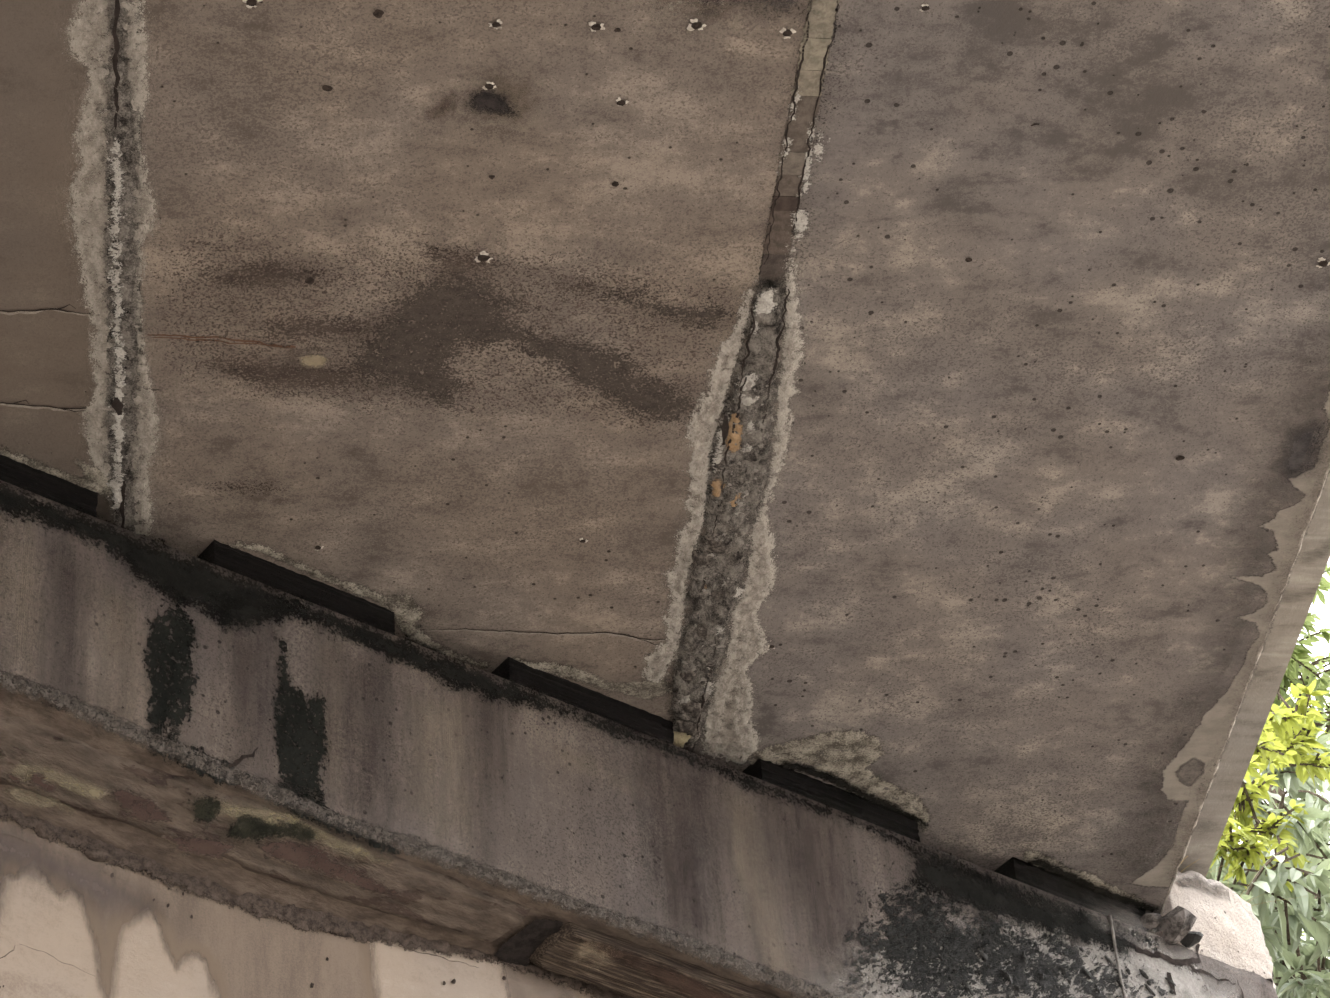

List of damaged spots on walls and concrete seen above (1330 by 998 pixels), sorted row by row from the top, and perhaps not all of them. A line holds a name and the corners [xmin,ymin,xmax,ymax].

crack [0,304,94,316]
crack [0,400,97,412]
leakage [0,0,937,830]
leakage [1023,385,1330,902]
leakage [0,817,378,998]
leakage [274,794,399,856]